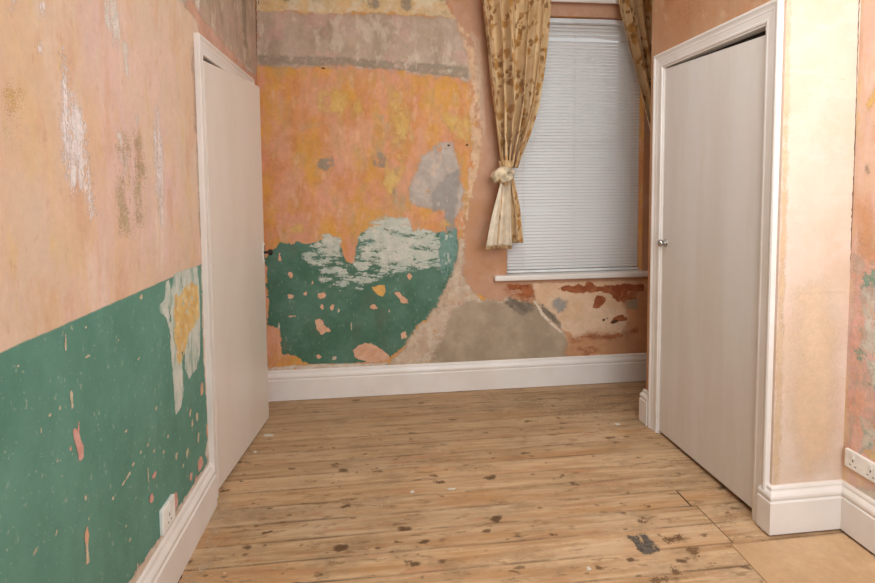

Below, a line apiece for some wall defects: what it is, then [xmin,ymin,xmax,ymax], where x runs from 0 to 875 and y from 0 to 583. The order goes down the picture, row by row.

peeling [178,0,484,364]
peeling [159,266,209,481]
peeling [844,252,875,462]